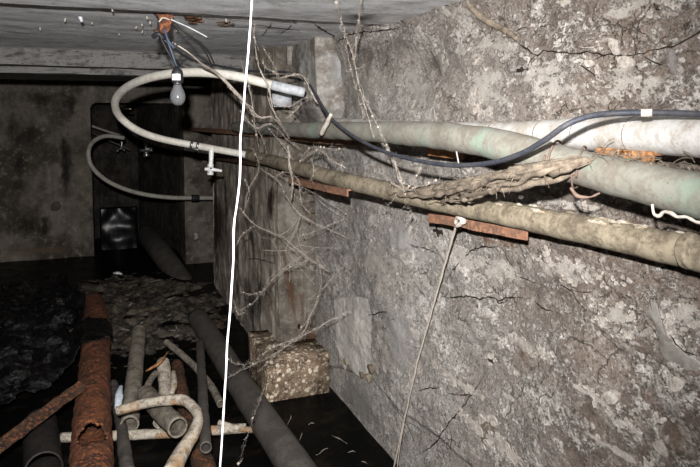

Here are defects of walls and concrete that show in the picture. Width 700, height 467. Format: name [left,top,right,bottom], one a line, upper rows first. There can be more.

crack [101,8,408,42]
crack [512,24,700,77]
crack [443,243,553,312]
crack [558,284,592,314]
crack [386,375,484,455]